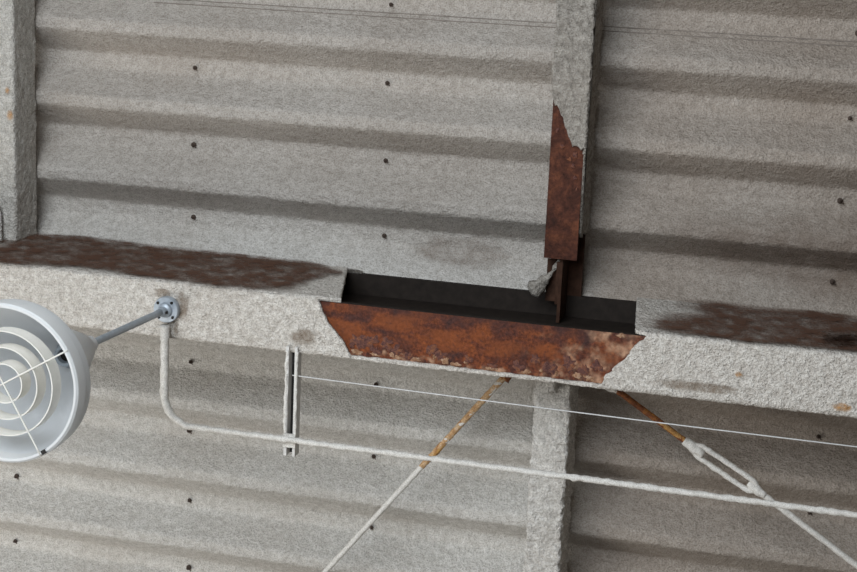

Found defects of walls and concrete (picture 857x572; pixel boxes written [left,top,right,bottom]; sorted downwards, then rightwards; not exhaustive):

rust [419,377,505,469]
rust [616,390,686,443]